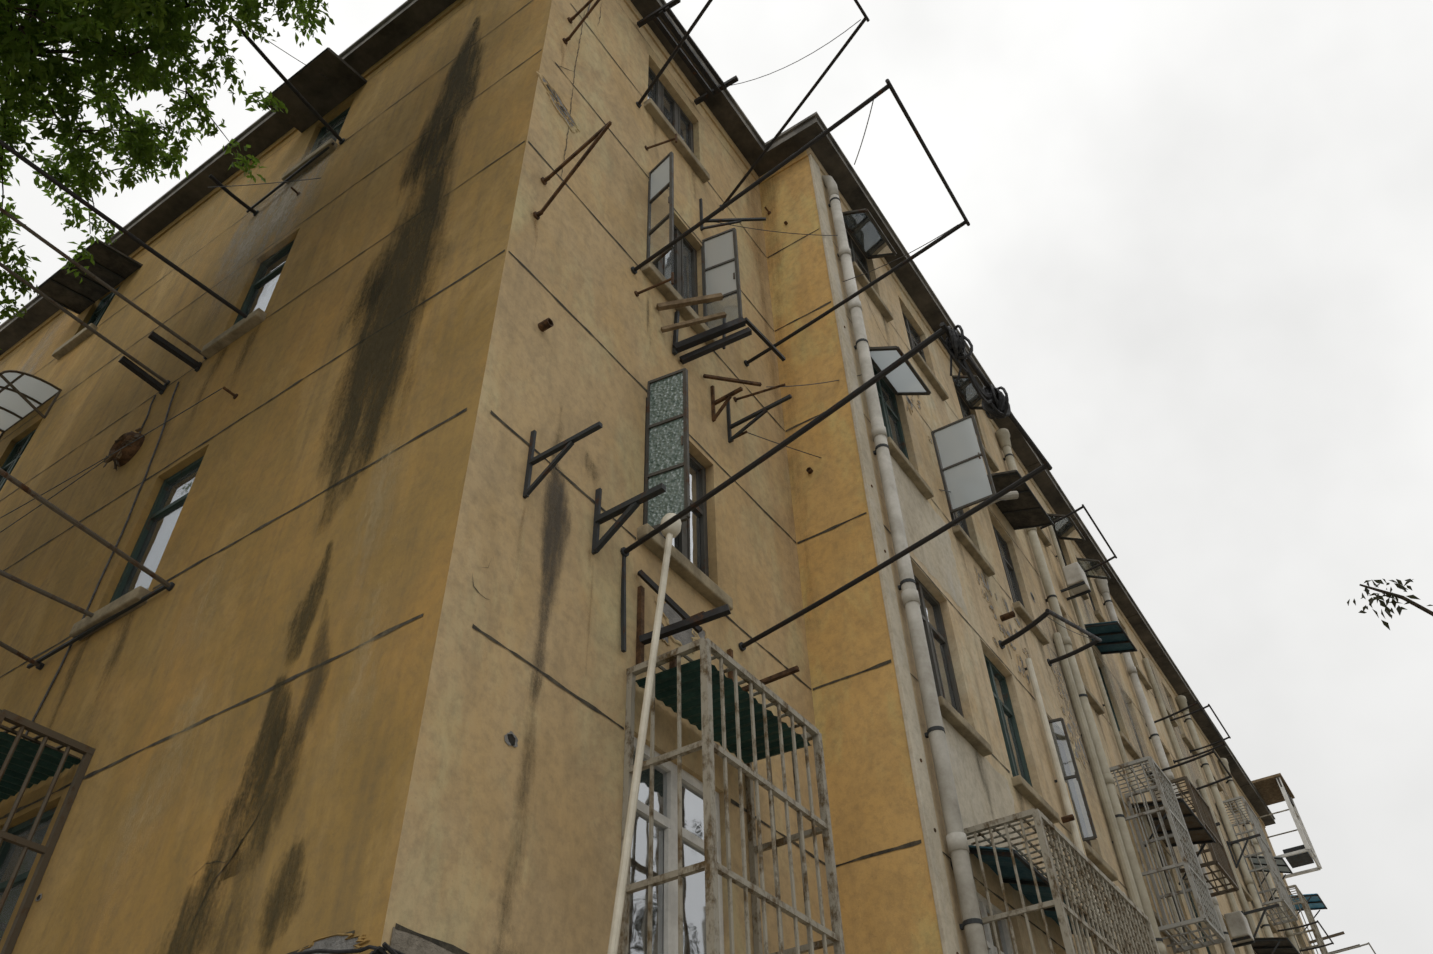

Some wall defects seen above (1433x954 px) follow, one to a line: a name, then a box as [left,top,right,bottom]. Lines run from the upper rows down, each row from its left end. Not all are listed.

damp [324,17,482,512]
damp [167,543,331,954]
damp [536,470,567,681]